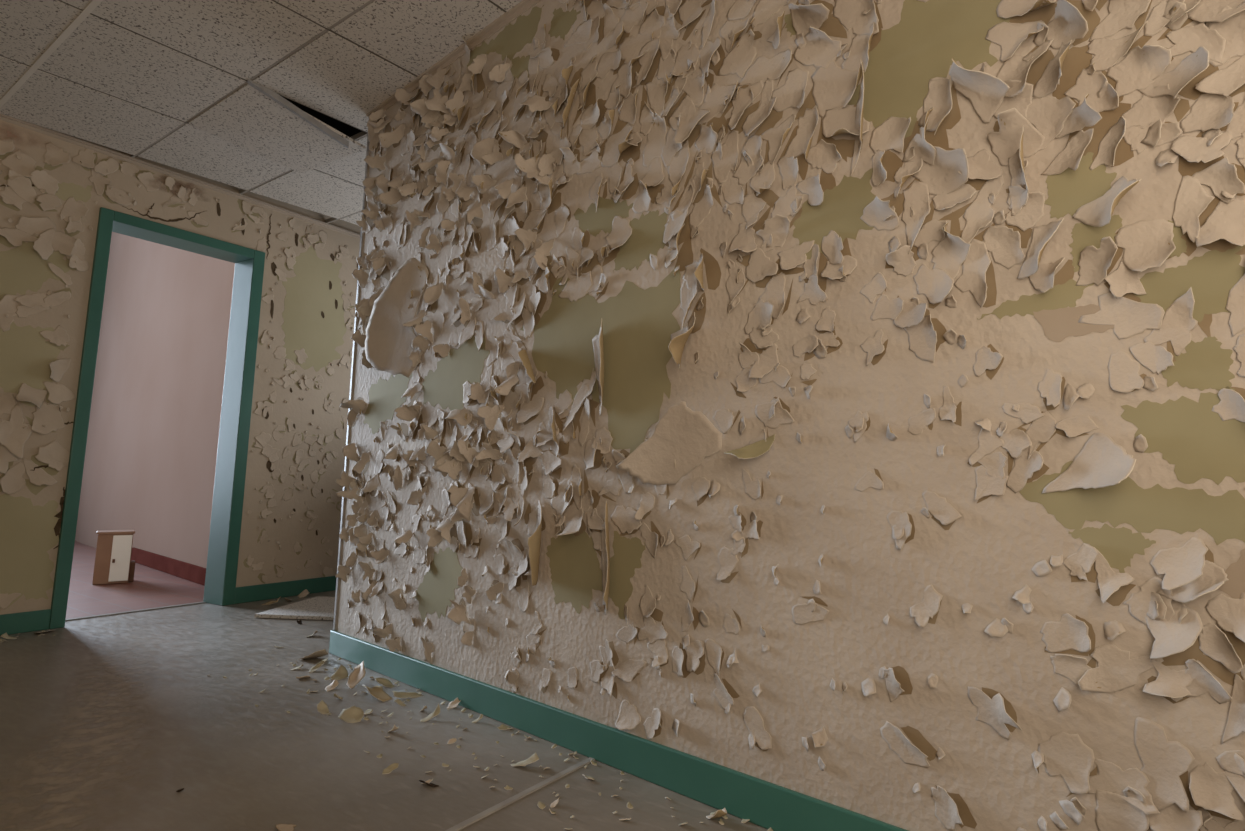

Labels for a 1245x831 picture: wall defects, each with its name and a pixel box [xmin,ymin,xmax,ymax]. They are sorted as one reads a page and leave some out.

peeling [0,138,221,609]
peeling [243,0,1245,751]
peeling [802,727,828,771]
peeling [880,721,945,768]
peeling [912,782,977,831]
peeling [1032,717,1245,831]